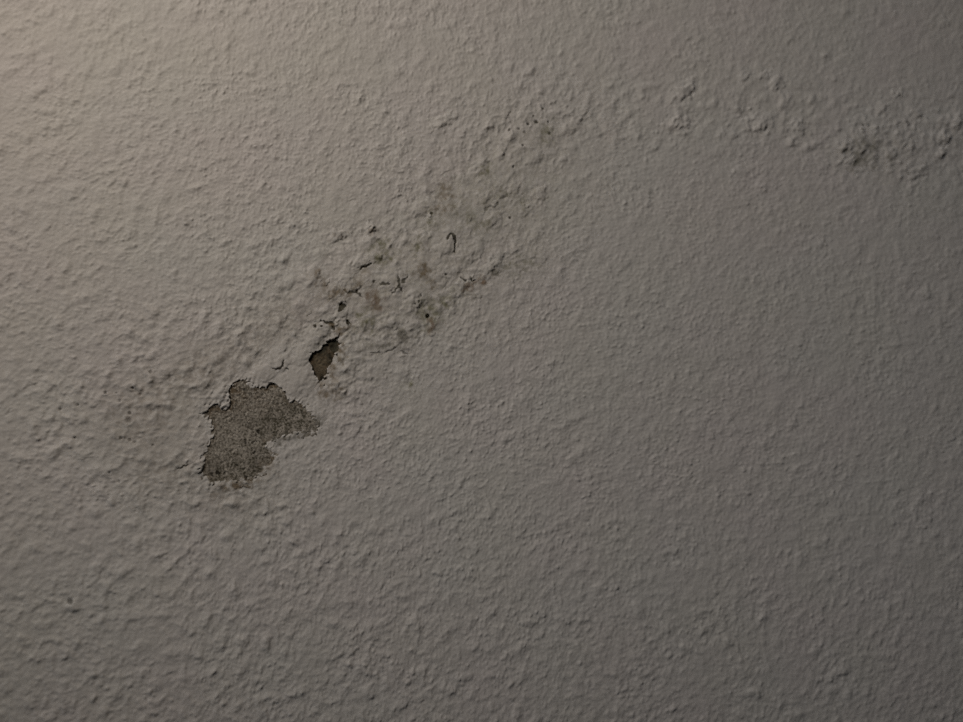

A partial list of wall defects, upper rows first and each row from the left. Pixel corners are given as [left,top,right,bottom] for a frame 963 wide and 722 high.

peeling [309,337,340,382]
peeling [201,380,322,489]